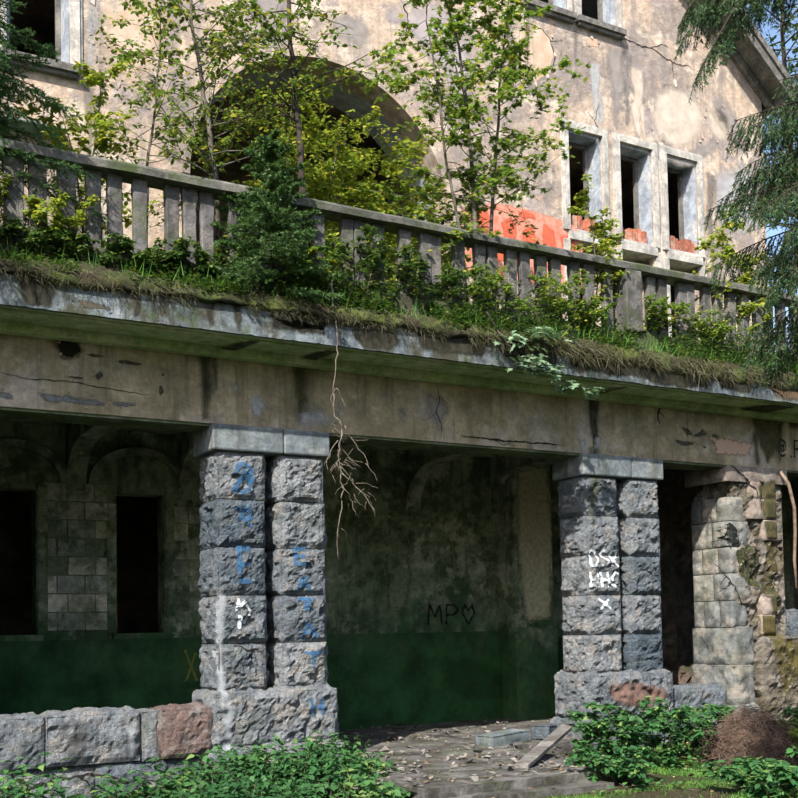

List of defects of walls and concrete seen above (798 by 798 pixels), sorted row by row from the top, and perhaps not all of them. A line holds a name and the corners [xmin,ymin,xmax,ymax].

crack [624,37,691,74]
spalling [54,340,105,359]
crack [1,372,149,395]
spalling [40,389,134,409]
crack [461,435,563,446]
flaking render [675,427,752,456]
spalling [711,479,781,618]
damp [756,612,798,694]